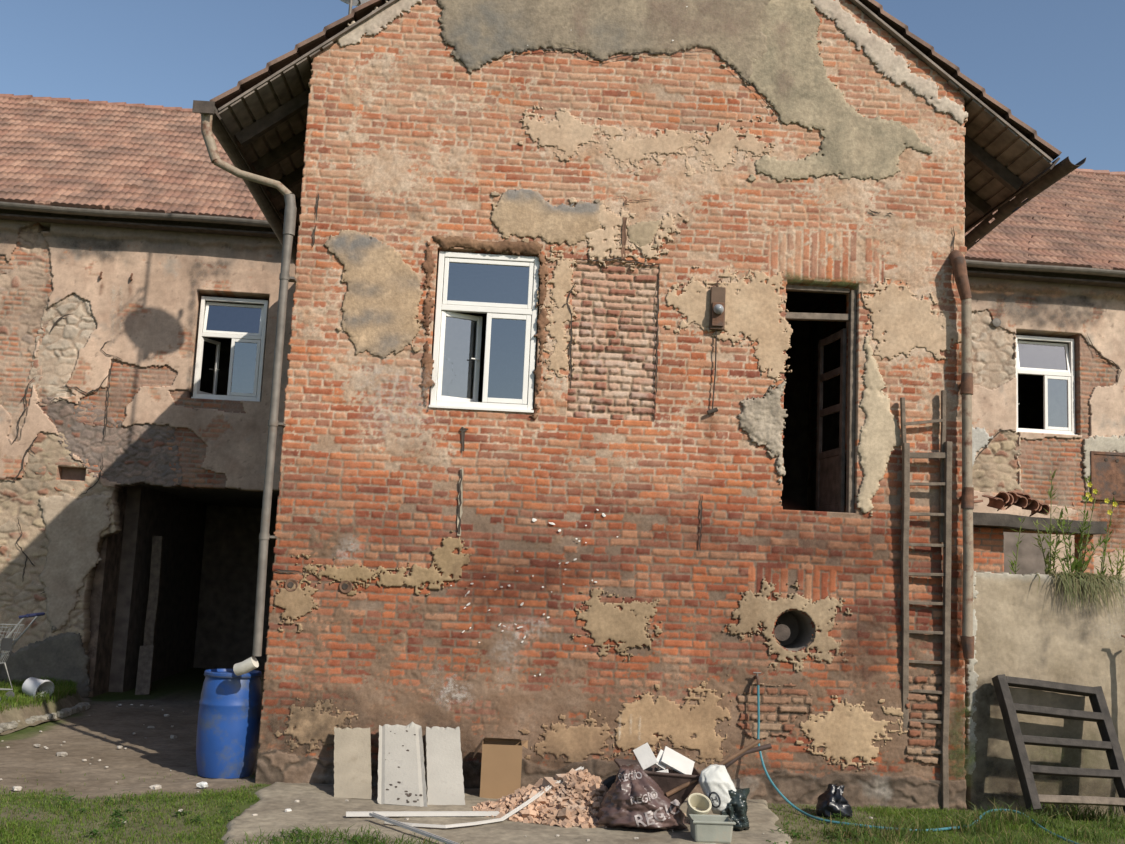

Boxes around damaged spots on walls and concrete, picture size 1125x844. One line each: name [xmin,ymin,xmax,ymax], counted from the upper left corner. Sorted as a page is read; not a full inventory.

peeling [437,0,933,182]
crack [9,378,38,481]
crack [60,341,122,496]
flaking render [0,222,246,698]
flaking render [972,334,1125,556]
crack [16,518,44,594]
hole [775,610,815,651]
peeling [274,698,358,753]
peeling [519,673,942,772]